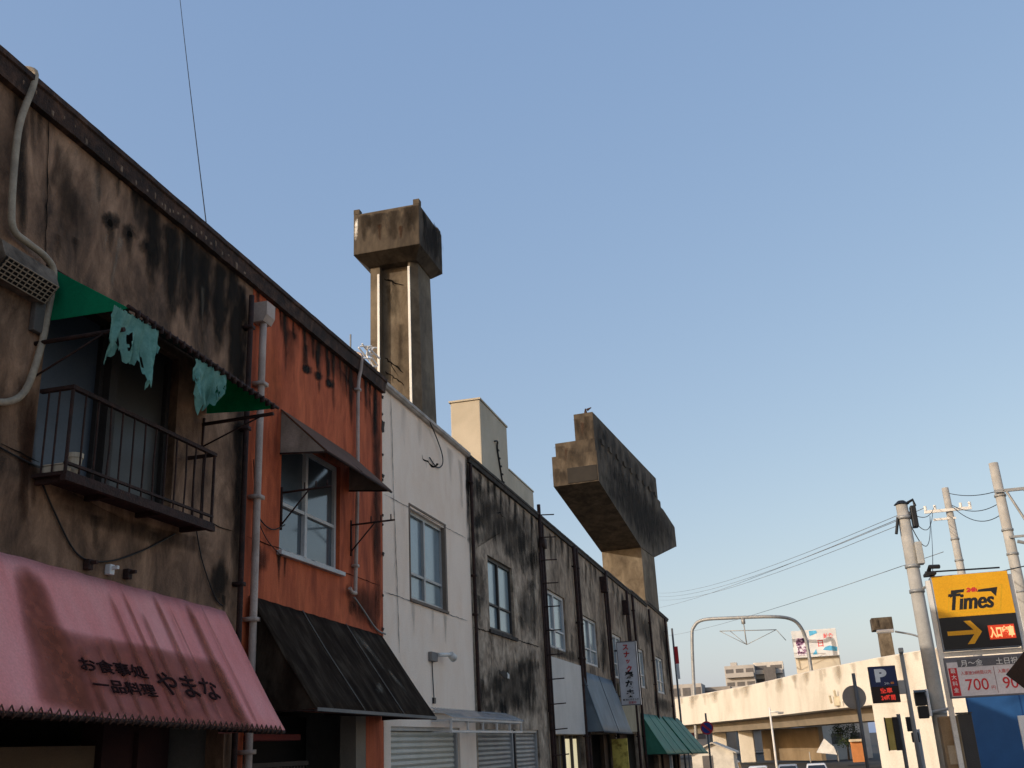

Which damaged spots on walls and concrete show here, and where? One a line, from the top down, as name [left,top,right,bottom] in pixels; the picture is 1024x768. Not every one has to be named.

water stain [103,190,259,382]
water stain [355,206,441,260]
water stain [212,423,243,608]
water stain [274,305,380,571]
crack [214,358,490,653]
water stain [466,462,533,566]
water stain [575,416,672,548]
water stain [481,664,536,713]
water stain [639,618,668,678]